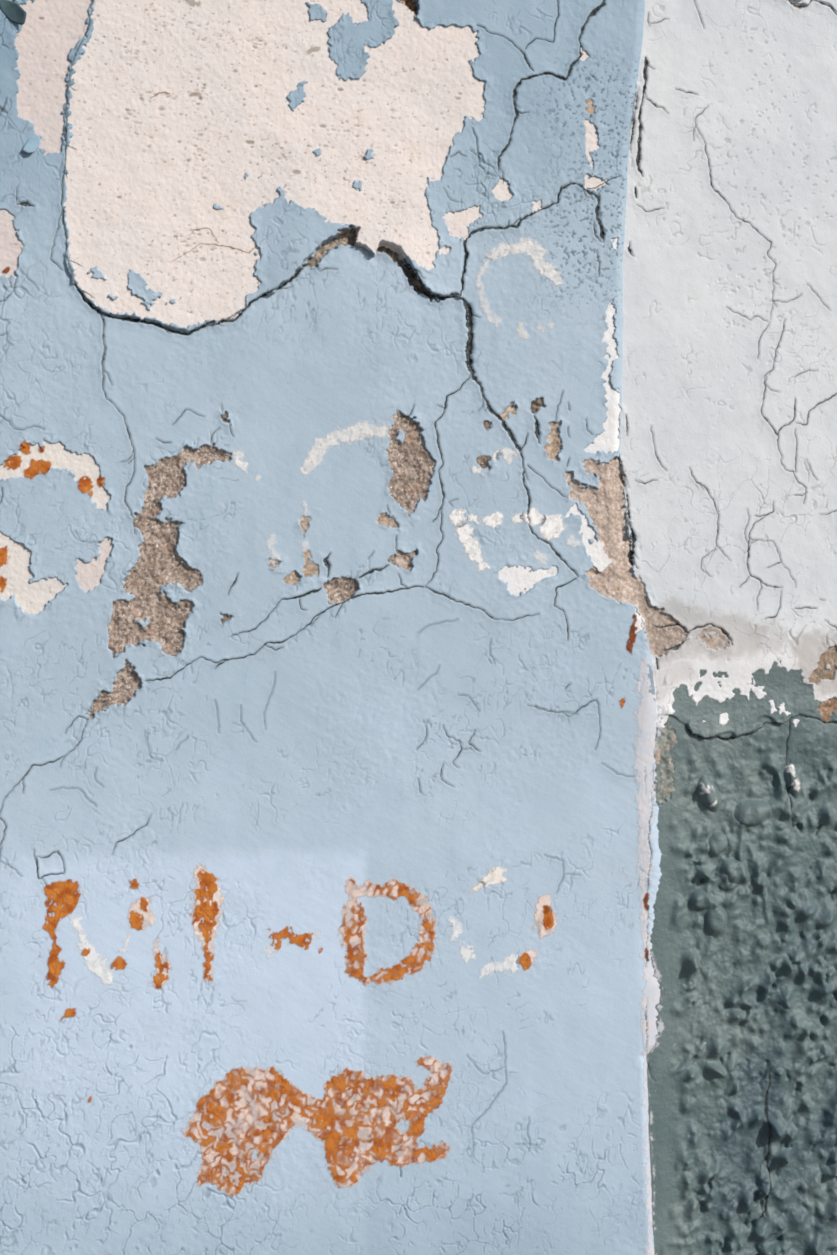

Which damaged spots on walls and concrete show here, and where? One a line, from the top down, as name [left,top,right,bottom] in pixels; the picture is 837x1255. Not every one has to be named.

peeling [0,0,485,328]
crack [451,0,605,184]
crack [0,0,337,532]
peeling [0,439,111,510]
peeling [0,532,113,614]
flaking render [87,444,232,719]
flaking render [268,517,358,604]
flaking render [376,411,435,528]
crack [147,57,837,739]
corrosion [626,614,637,653]
crack [417,695,479,793]
crack [527,684,660,963]